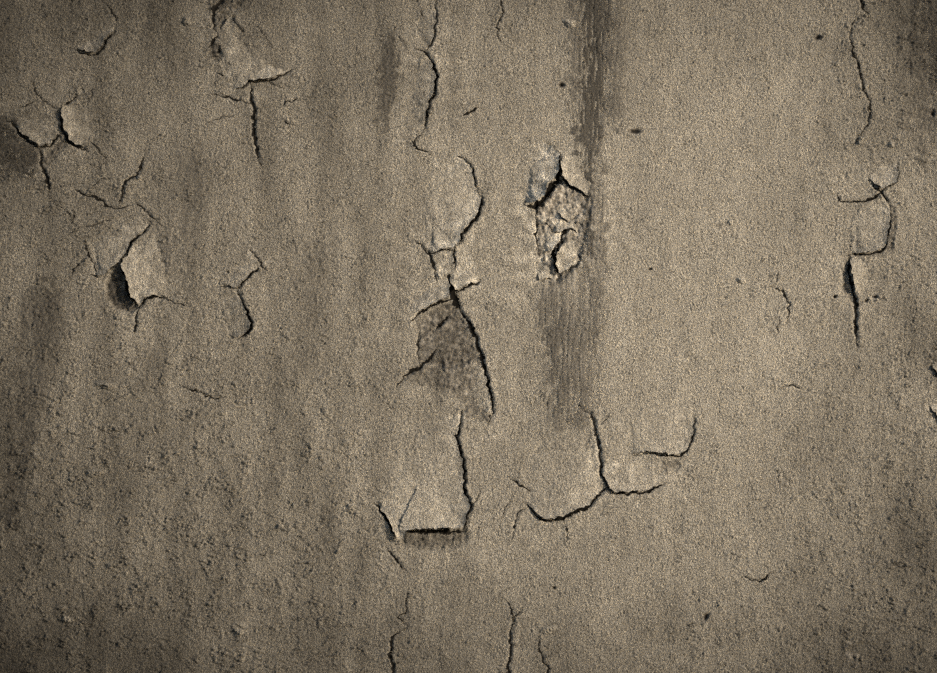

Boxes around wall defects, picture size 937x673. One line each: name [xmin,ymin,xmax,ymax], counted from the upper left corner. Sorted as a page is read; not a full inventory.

peeling [71,1,117,56]
peeling [208,0,292,165]
crack [849,0,871,147]
peeling [6,78,188,332]
peeling [219,249,269,340]
peeling [376,156,494,547]
peeling [524,143,597,285]
damp [538,0,626,428]
peeling [833,160,899,348]
peeling [501,401,695,542]
crack [387,548,409,673]
crack [504,598,523,673]